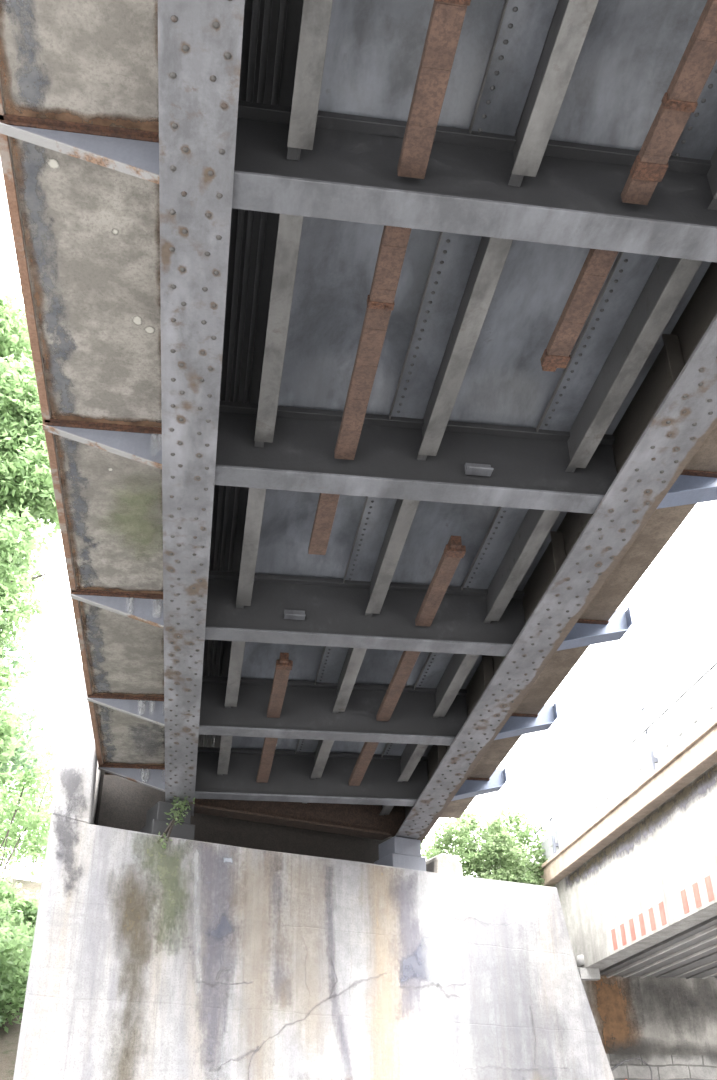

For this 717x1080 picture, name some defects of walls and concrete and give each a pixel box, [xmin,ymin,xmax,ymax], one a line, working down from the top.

leakage [2,0,49,108]
rust [0,6,159,132]
rust [397,0,467,179]
rust [621,0,717,205]
leakage [16,141,76,415]
rust [334,225,412,460]
rust [540,248,618,372]
rust [308,493,340,555]
rust [415,535,466,627]
leakage [191,846,237,1066]
leakage [398,880,437,1014]
leakage [628,977,717,1027]